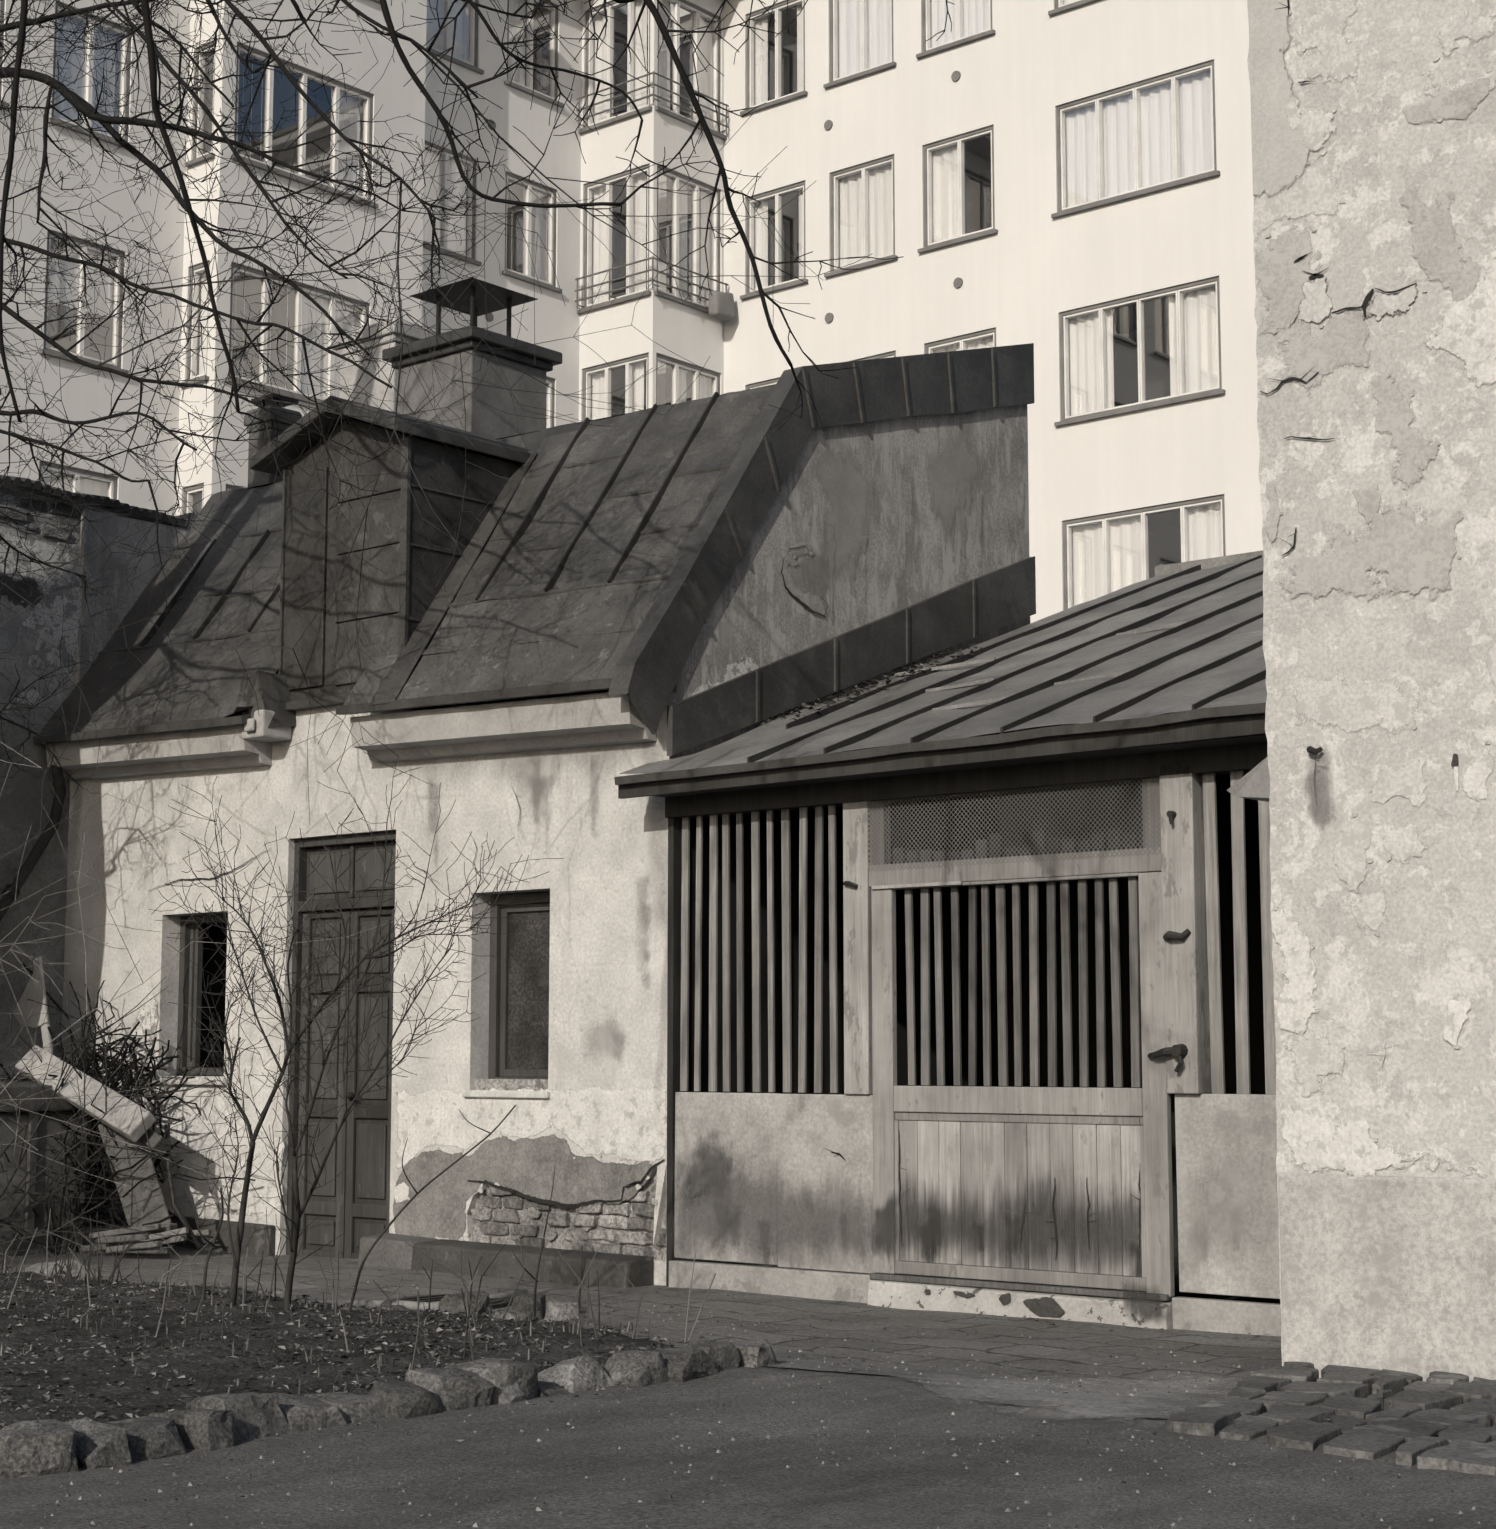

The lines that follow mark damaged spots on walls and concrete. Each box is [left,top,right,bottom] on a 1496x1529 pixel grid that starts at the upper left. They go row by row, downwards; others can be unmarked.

peeling [1402,78,1490,124]
flaking render [1248,0,1441,523]
peeling [1399,186,1496,388]
flaking render [1265,482,1283,542]
flaking render [0,494,81,715]
peeling [1367,757,1428,807]
peeling [1451,740,1495,801]
peeling [1271,906,1318,1035]
flaking render [1443,999,1472,1049]
peeling [393,1086,667,1258]
leakage [678,1147,1161,1319]
peeling [1281,1105,1491,1178]